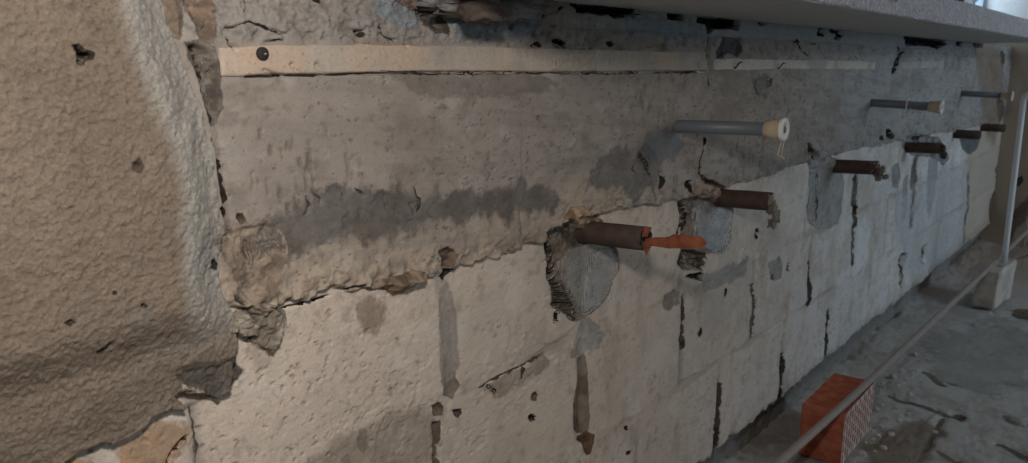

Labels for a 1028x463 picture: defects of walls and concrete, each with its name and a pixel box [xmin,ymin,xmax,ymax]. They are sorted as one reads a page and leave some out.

crack [189,48,212,124]
crack [225,2,283,48]
crack [354,26,392,40]
crack [244,33,709,85]
crack [216,159,228,230]
spalling [211,213,288,311]
crack [281,285,367,308]
spalling [438,246,459,280]
spalling [544,221,620,325]
spalling [676,174,734,281]
spalling [807,142,845,229]
spalling [432,402,462,418]